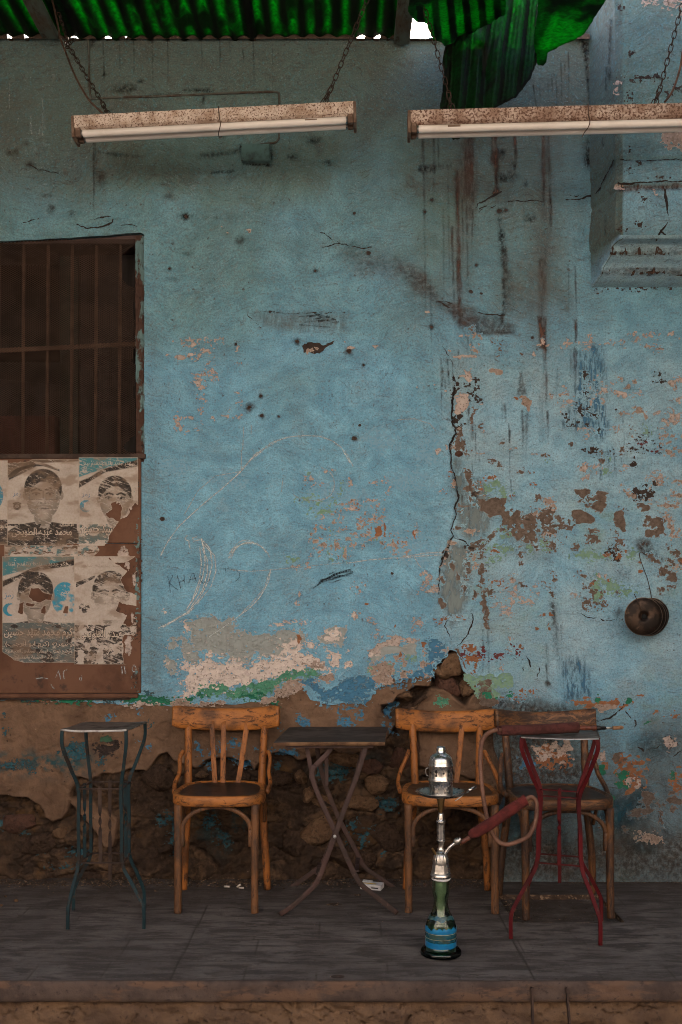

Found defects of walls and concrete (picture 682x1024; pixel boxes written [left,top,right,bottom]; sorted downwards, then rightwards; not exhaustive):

corrosion [447,142,474,326]
crack [476,158,682,241]
corrosion [538,317,546,355]
crack [438,350,474,646]
spalling [0,324,682,880]